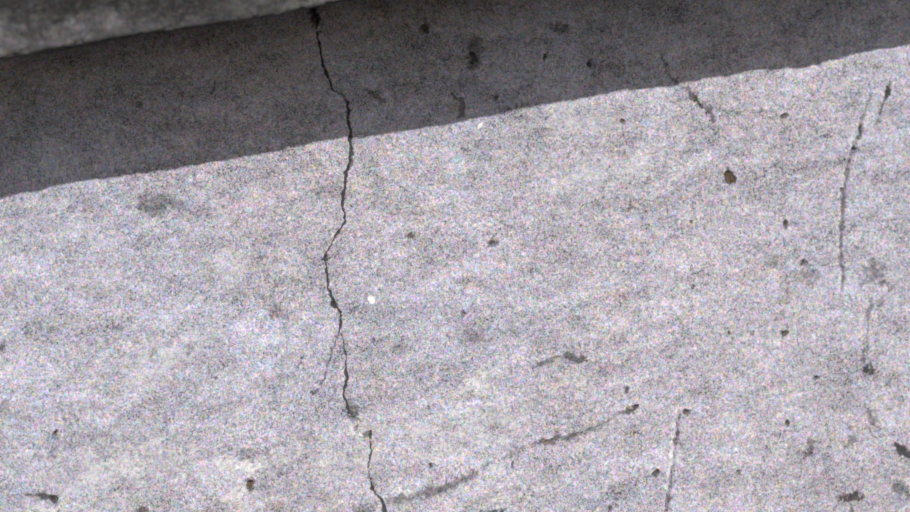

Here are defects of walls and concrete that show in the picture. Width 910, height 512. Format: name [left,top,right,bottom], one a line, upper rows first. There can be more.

crack [308,6,387,512]